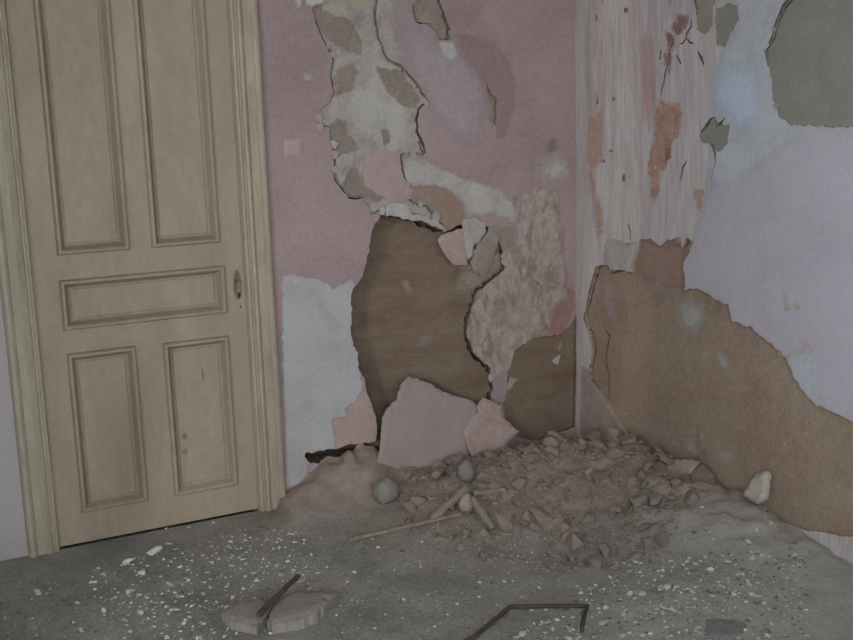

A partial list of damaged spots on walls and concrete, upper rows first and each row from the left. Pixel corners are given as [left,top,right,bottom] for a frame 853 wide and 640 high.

flaking render [304,0,853,537]